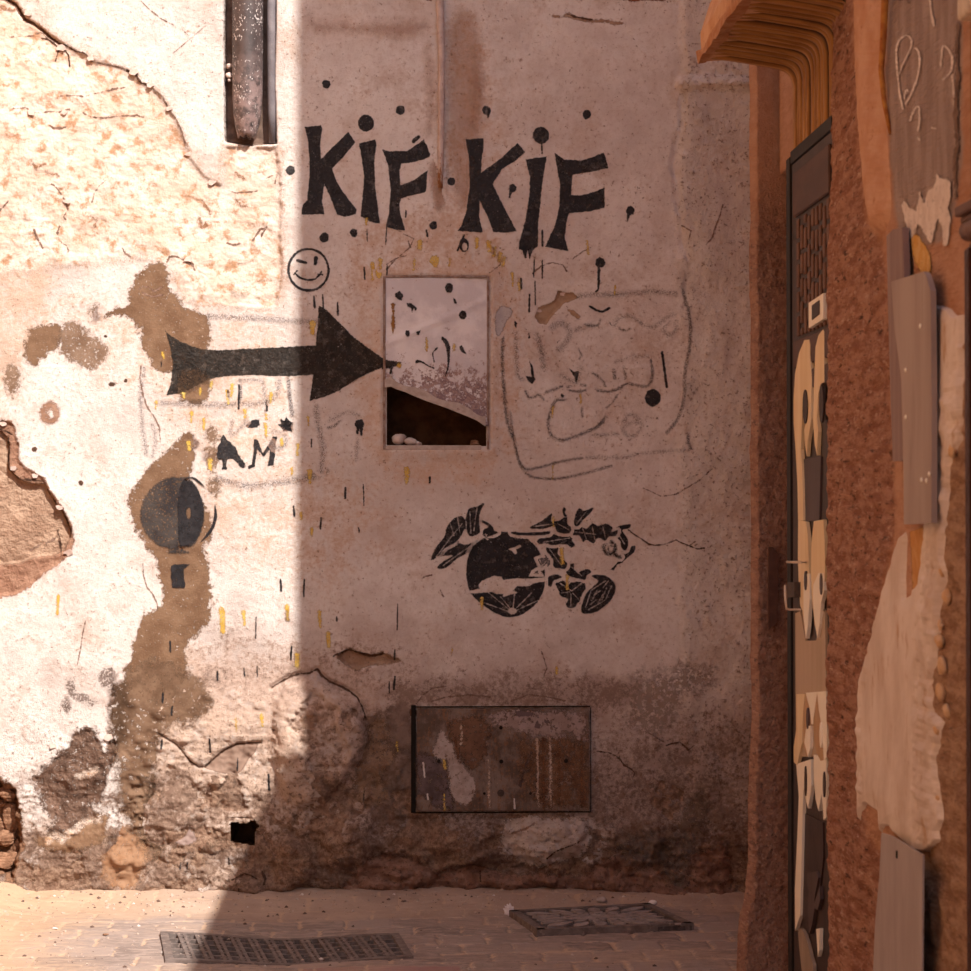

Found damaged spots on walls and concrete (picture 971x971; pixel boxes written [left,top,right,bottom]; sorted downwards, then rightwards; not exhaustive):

crack [2,0,186,143]
flaking render [0,0,285,311]
flaking render [535,291,580,325]
flaking render [0,420,75,599]
damp [33,426,222,890]
crack [157,724,277,768]
crack [271,668,367,732]
flaking render [333,647,401,670]
damp [626,662,716,735]
spalling [0,777,26,883]